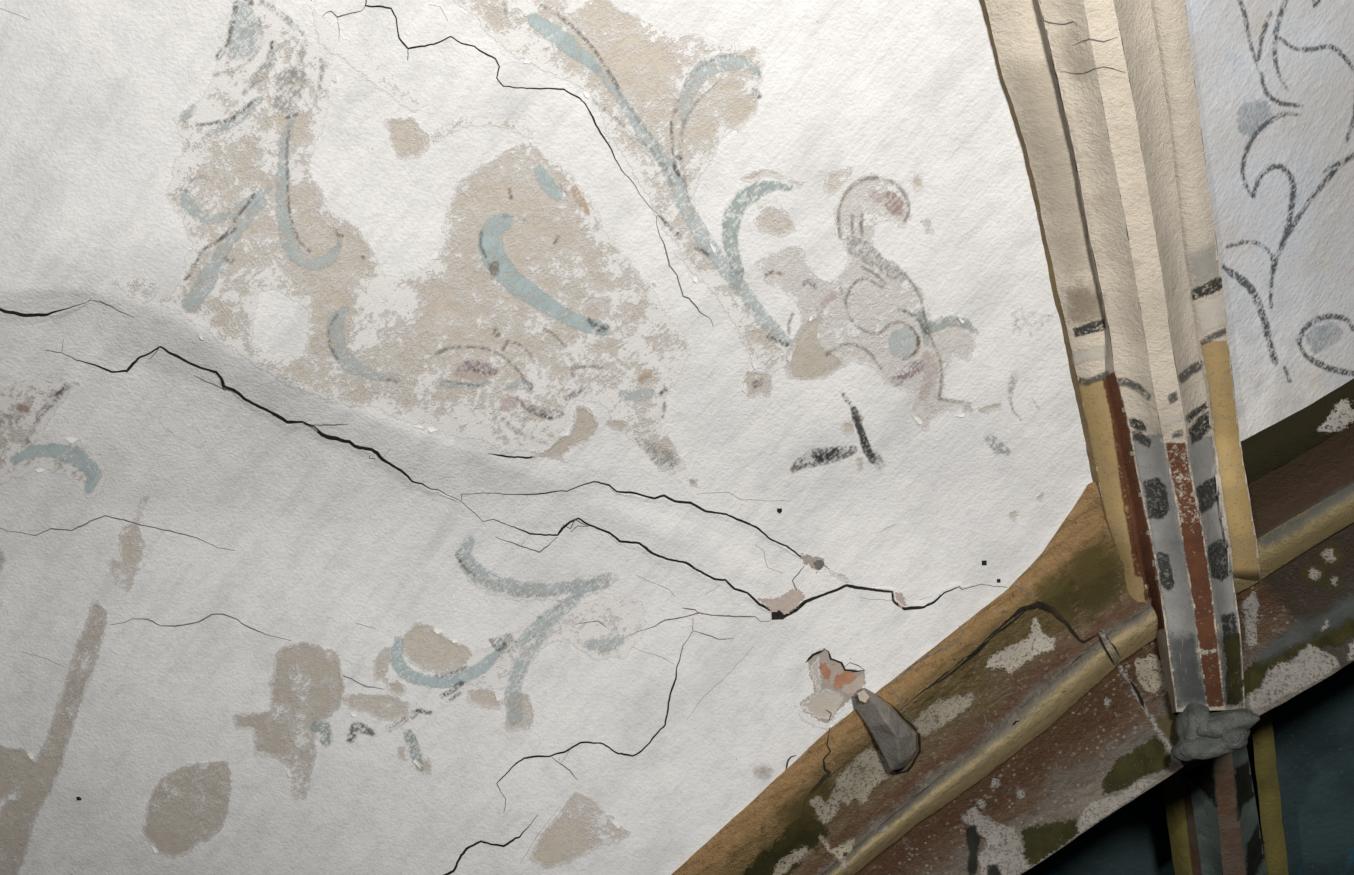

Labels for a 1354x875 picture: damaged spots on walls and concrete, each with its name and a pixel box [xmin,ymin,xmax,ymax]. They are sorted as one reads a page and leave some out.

crack [311,0,713,325]
crack [0,300,1120,875]
flaking render [800,649,866,723]